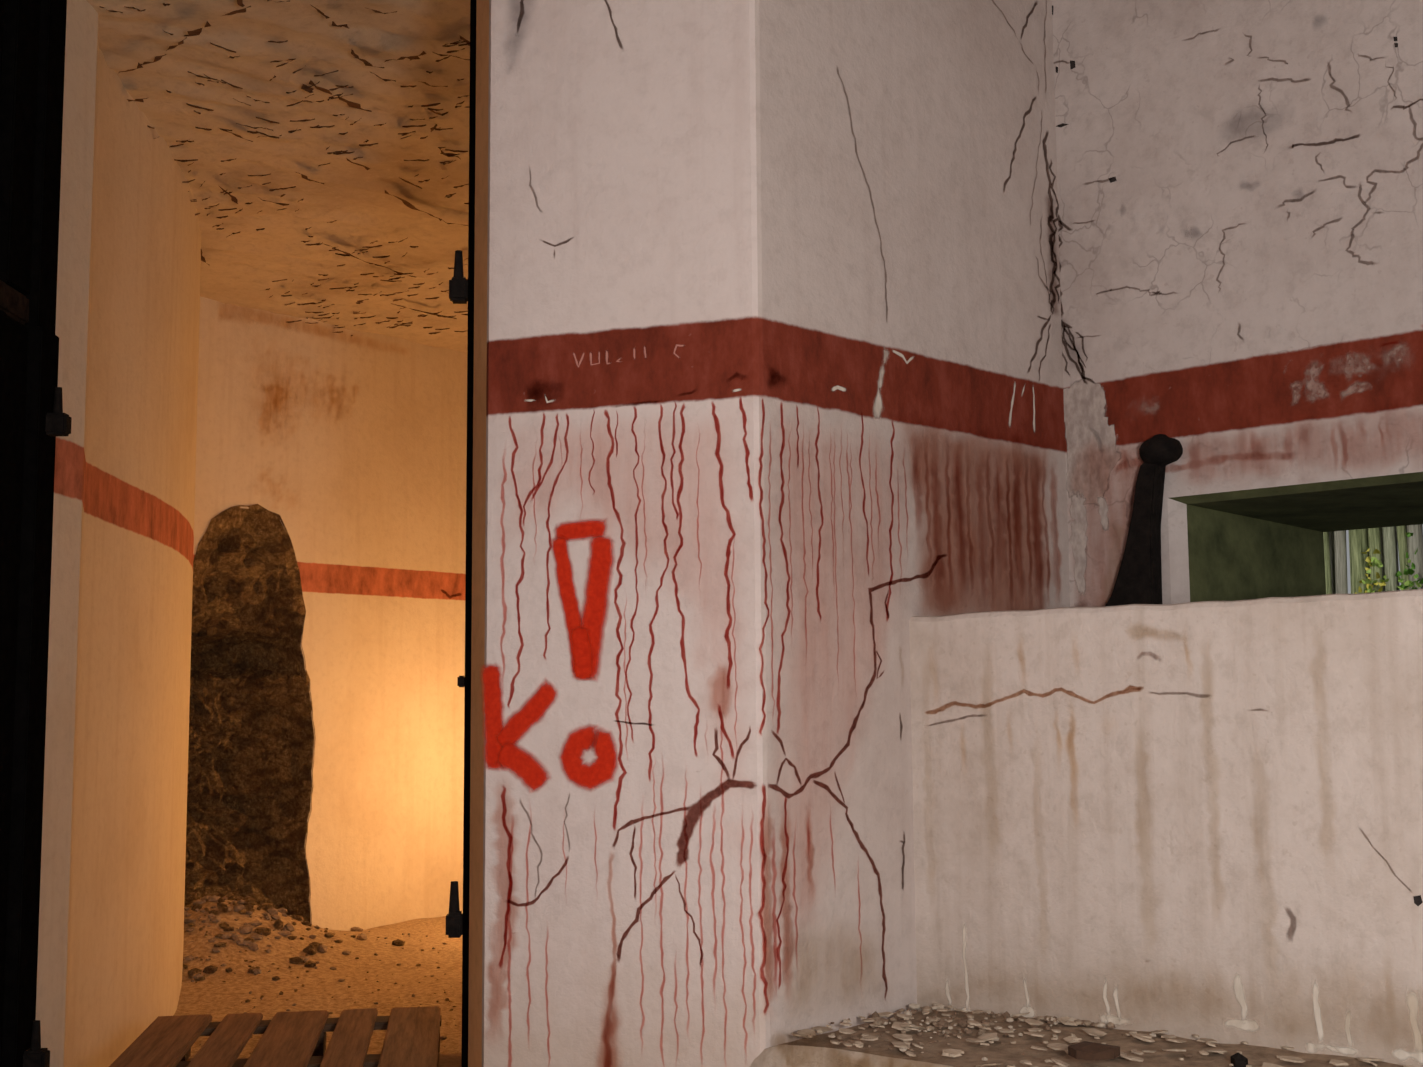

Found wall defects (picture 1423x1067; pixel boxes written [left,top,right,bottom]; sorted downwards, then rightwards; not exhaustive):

crack [1004,98,1094,383]
crack [1291,135,1359,148]
rust [508,415,569,706]
rust [588,403,700,828]
rust [740,399,823,733]
peeling [874,350,913,416]
peeling [1063,379,1121,594]
peeling [1293,345,1404,403]
crack [613,554,946,997]
leakage [1101,983,1130,1025]
leakage [1307,984,1356,1054]
leakage [1394,994,1423,1063]